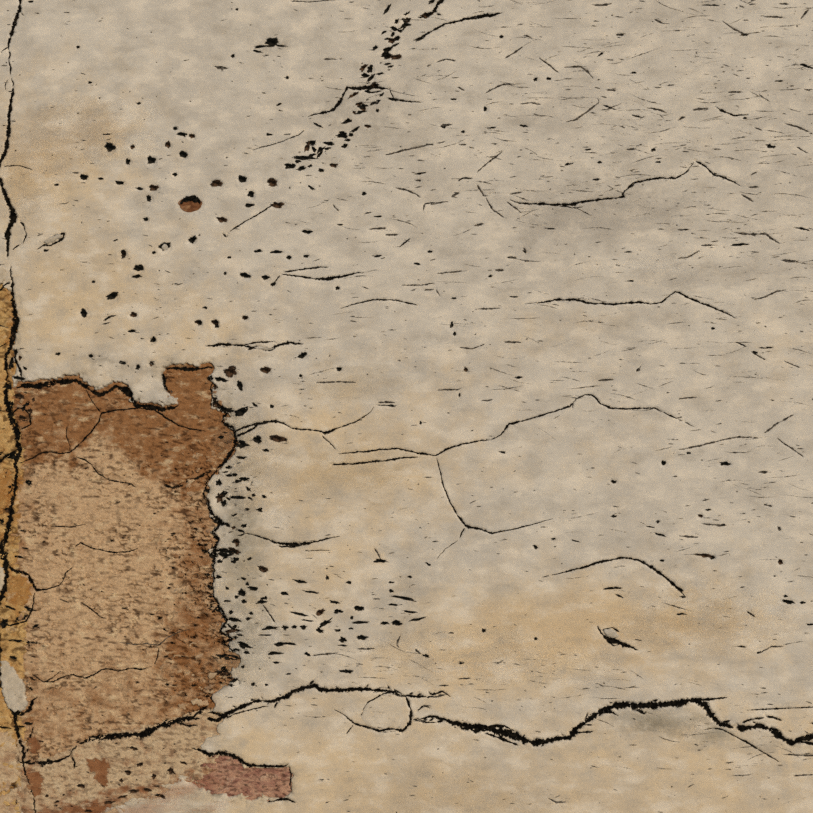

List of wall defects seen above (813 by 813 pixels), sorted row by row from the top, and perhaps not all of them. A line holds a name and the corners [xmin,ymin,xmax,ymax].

crack [410,0,501,40]
crack [254,85,421,150]
crack [397,152,758,226]
crack [0,0,212,660]
crack [207,341,301,351]
crack [273,266,364,284]
crack [343,271,461,308]
crack [527,291,735,318]
crack [679,415,804,457]
spalling [0,267,293,813]
crack [164,383,692,652]
crack [0,672,813,813]